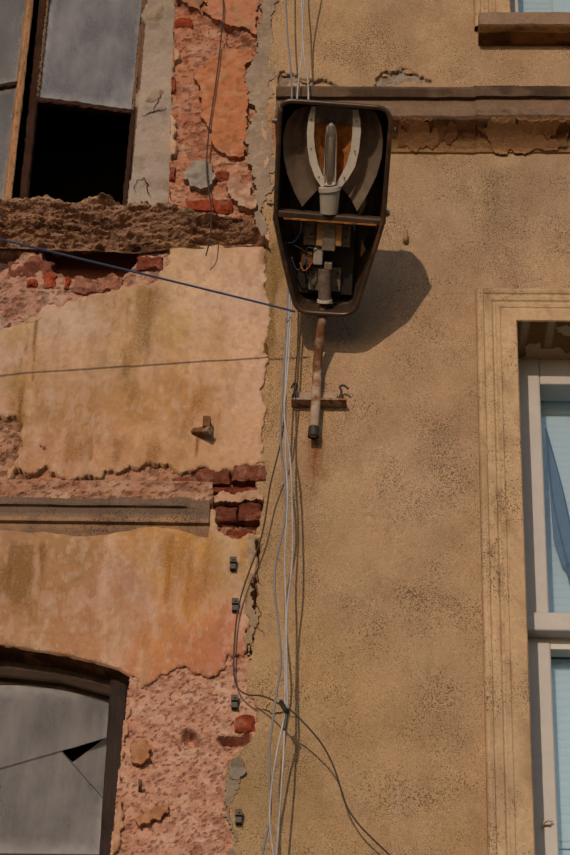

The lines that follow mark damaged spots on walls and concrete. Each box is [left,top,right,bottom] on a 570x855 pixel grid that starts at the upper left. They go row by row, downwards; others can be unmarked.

flaking render [168,0,263,226]
peeling [376,69,431,86]
peeling [397,117,459,153]
peeling [478,117,570,155]
flaking render [0,248,170,330]
flaking render [0,419,267,539]
flaking render [110,654,259,855]